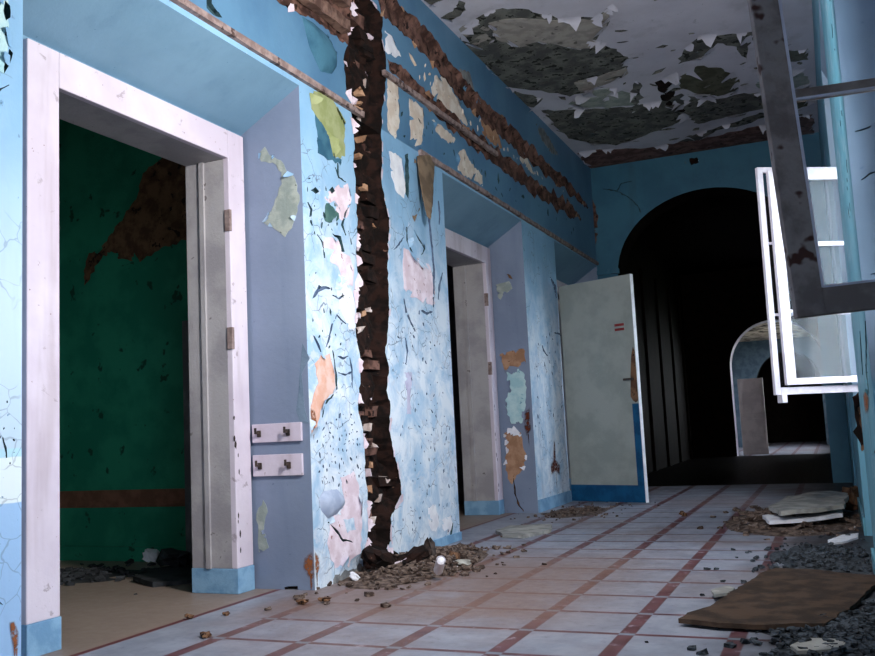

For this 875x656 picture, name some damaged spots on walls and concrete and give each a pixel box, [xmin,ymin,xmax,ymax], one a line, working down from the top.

peeling [0,0,13,74]
peeling [788,44,811,88]
peeling [797,100,817,135]
peeling [84,158,187,285]
peeling [258,147,310,237]
flaking render [277,0,768,584]
flaking render [852,392,875,455]